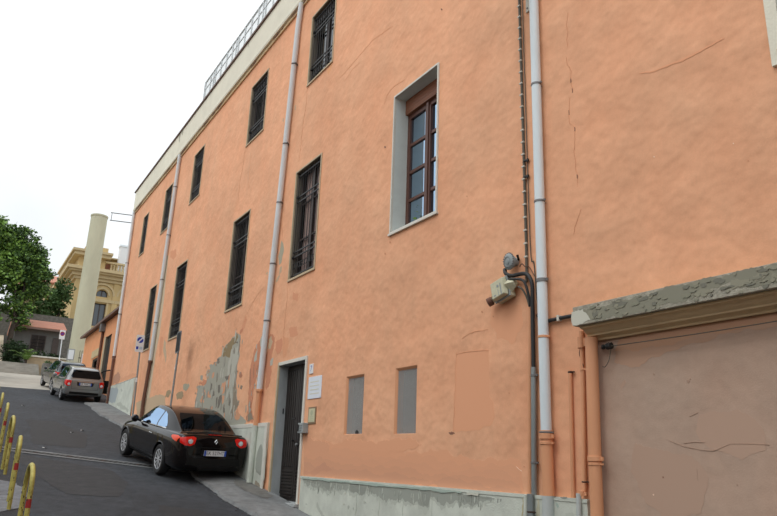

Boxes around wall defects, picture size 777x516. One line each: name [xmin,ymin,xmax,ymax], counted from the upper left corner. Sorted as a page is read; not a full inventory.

spalling [136,255,283,425]
water stain [303,479,502,516]